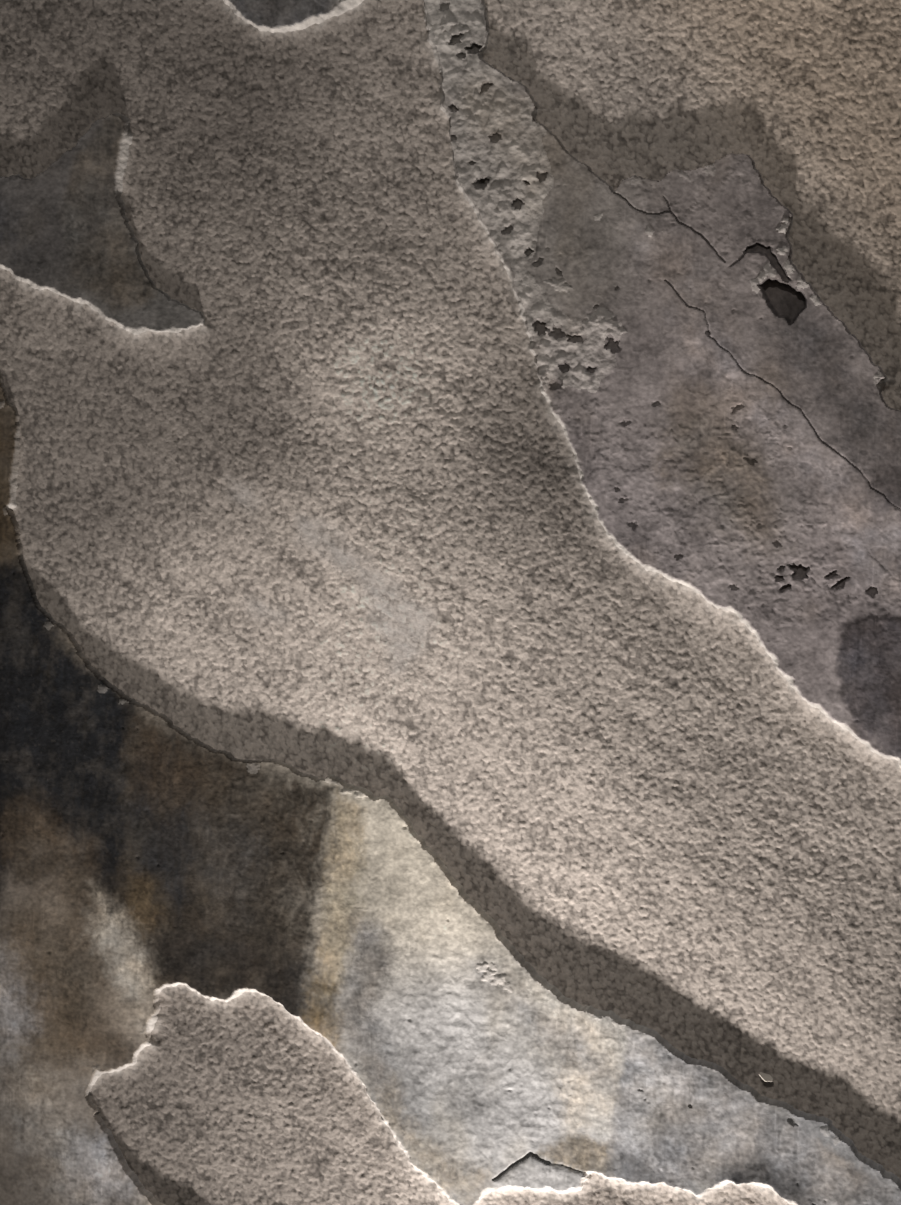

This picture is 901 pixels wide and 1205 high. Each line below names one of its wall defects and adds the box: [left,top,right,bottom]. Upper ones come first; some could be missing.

flaking render [223,0,364,33]
flaking render [0,112,205,335]
flaking render [424,0,901,411]
crack [613,192,747,267]
flaking render [450,143,901,767]
crack [664,279,900,509]
flaking render [0,372,901,1205]